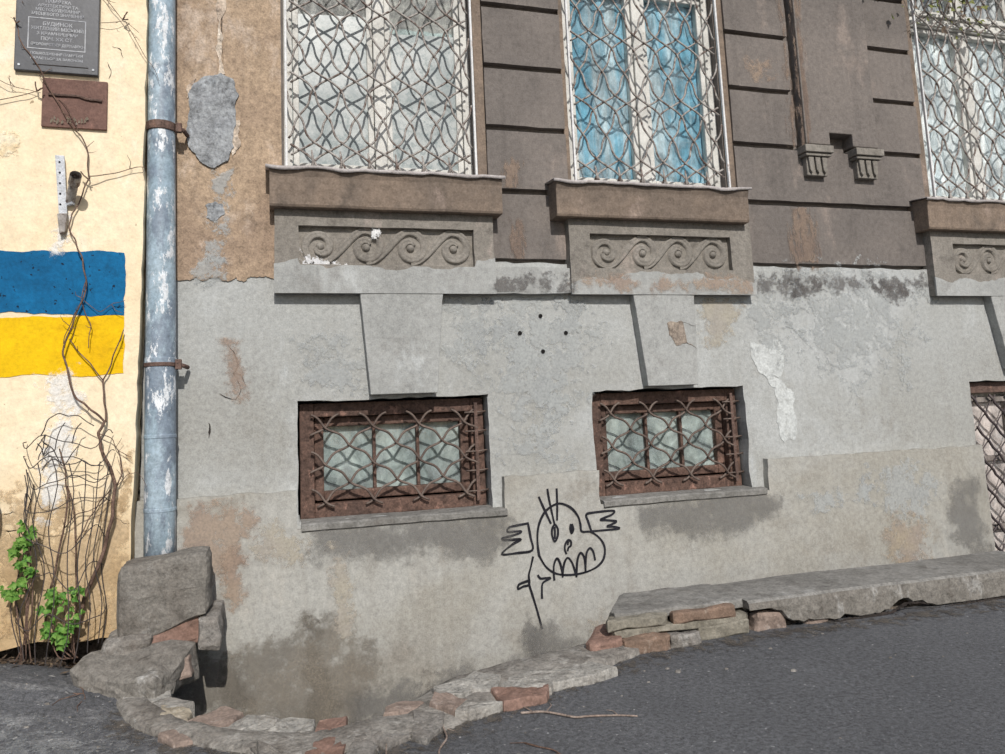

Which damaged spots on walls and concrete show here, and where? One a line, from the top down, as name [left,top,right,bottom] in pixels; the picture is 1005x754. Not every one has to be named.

peeling [466,271,637,472]
peeling [656,256,937,443]
leakage [175,517,506,724]